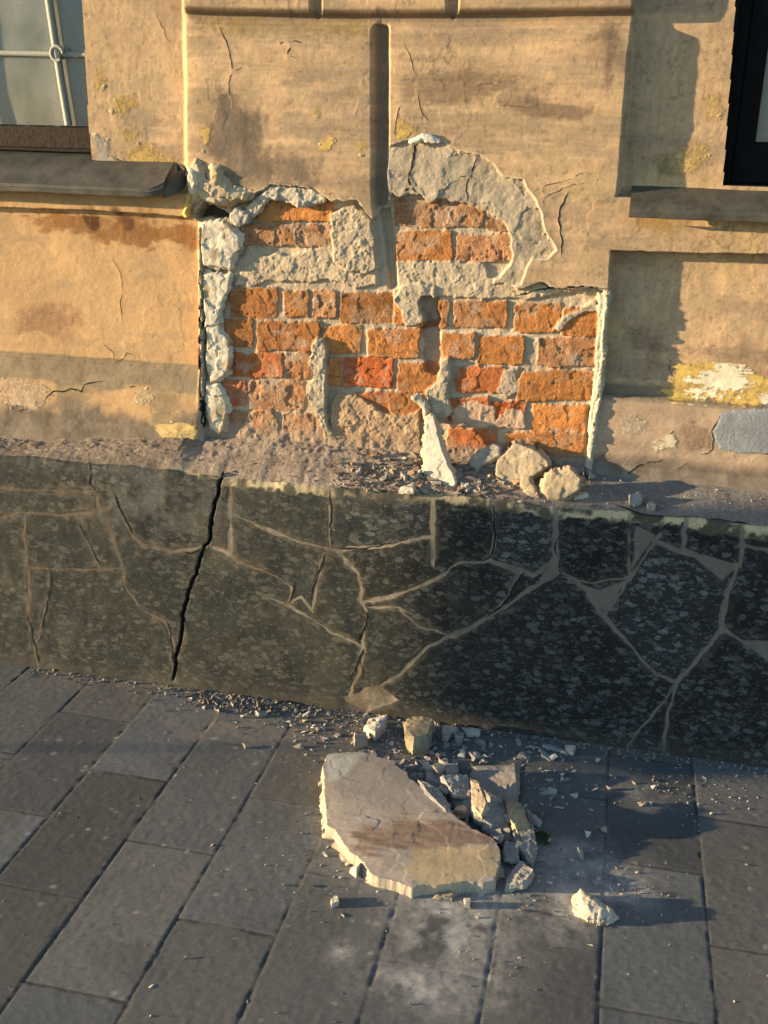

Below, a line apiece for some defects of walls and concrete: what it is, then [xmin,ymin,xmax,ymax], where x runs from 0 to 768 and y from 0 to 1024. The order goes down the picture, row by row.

crack [533,172,584,255]
flaking render [155,119,613,471]
crack [20,349,131,411]
peeling [657,358,768,408]
crack [166,472,224,679]